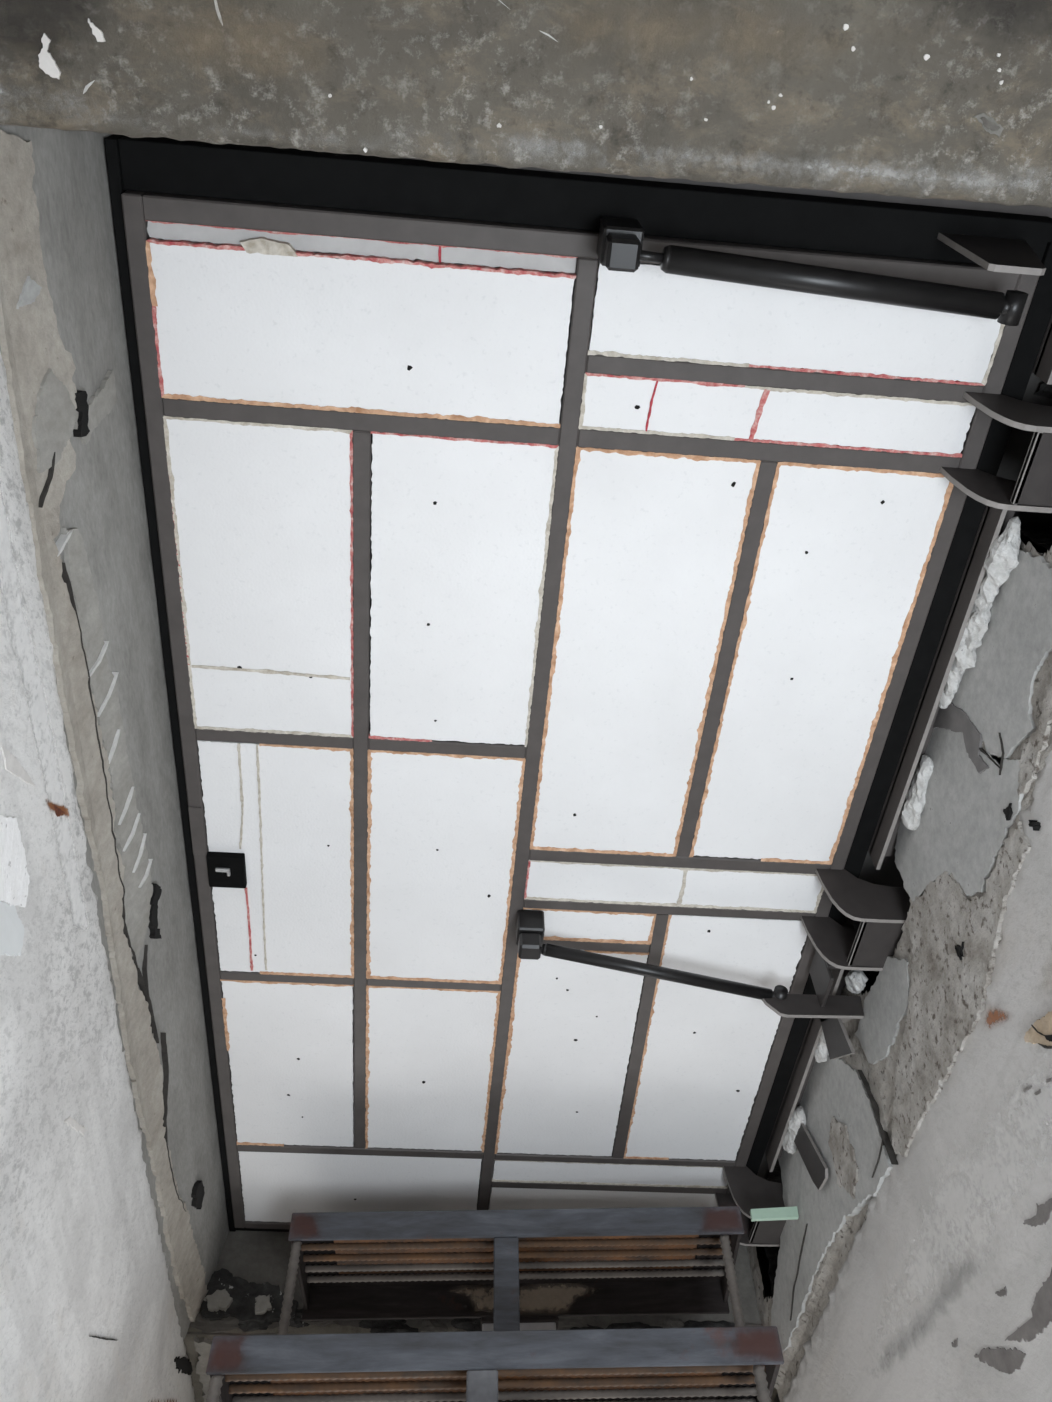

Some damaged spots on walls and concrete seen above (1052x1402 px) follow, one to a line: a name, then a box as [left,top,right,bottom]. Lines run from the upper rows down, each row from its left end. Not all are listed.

spalling [891,665,1052,1157]
peeling [1023,1198,1052,1227]
peeling [974,1268,1052,1374]